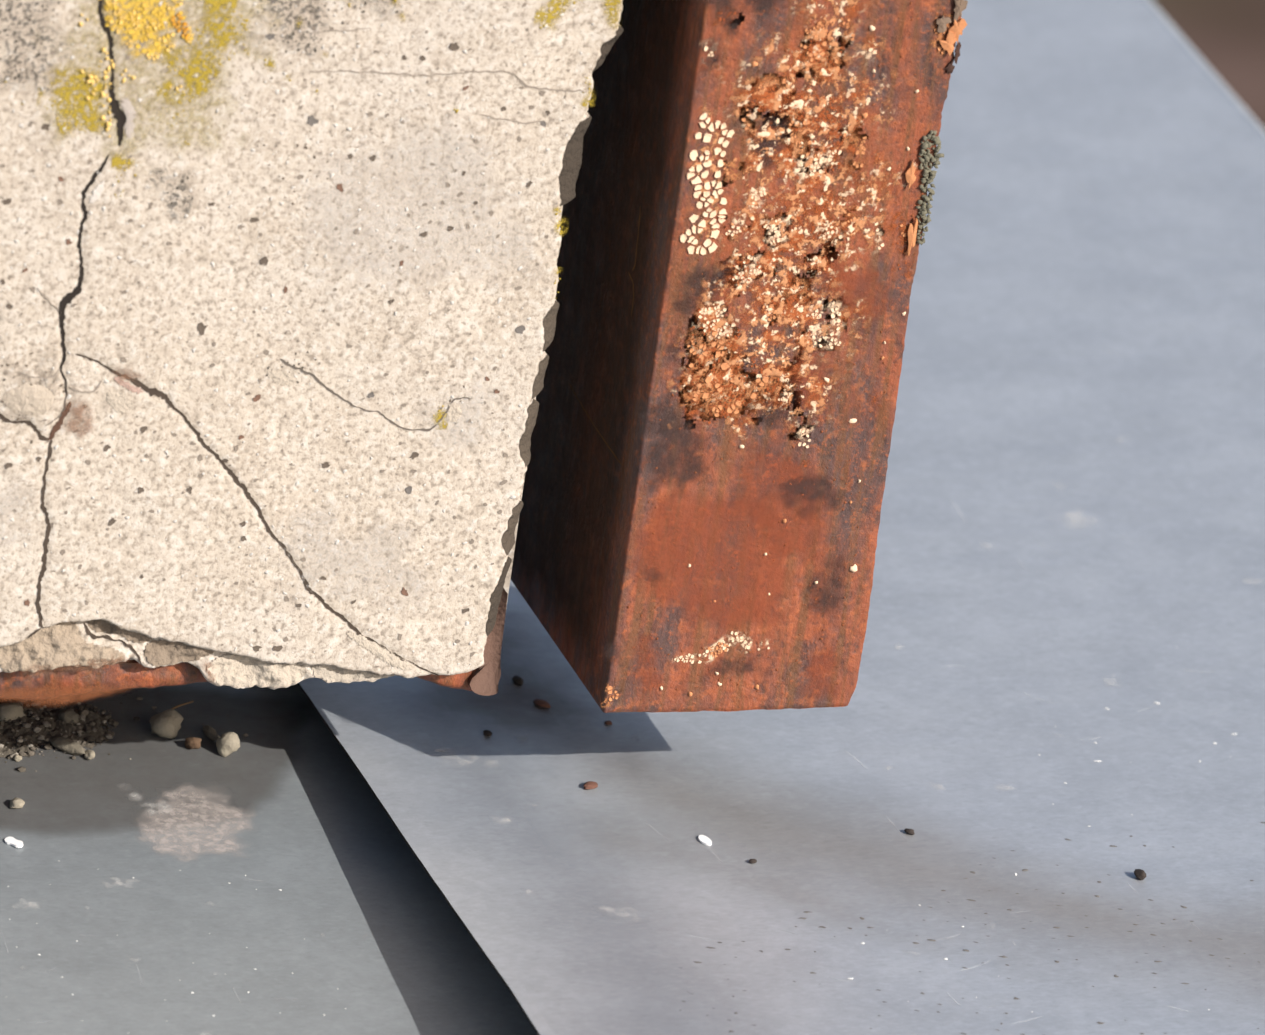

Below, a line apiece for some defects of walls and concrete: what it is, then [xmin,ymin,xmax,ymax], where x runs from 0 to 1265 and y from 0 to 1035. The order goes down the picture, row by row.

rust [936,0,968,74]
spalling [423,169,478,231]
rust [673,29,889,433]
rust [882,213,918,278]
rust [905,159,916,190]
crack [0,0,440,676]
crack [280,358,472,432]
spalling [0,609,416,688]
rust [0,687,111,702]